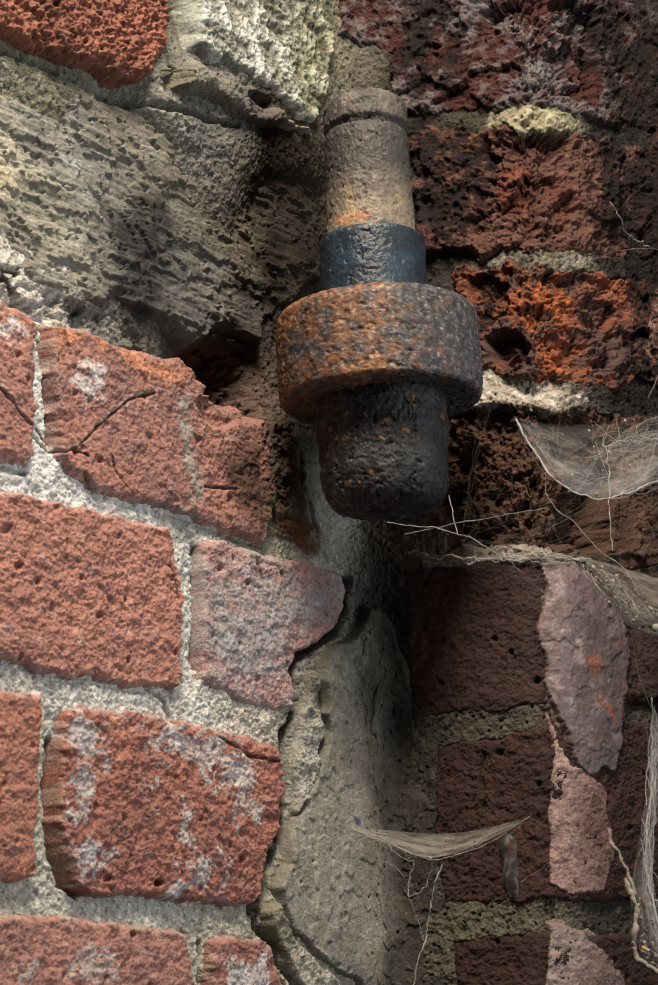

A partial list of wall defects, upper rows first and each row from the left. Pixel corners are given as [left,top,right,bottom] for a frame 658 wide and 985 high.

crack [288,640,322,668]
efflorescence [56,713,108,826]
efflorescence [144,716,261,824]
efflorescence [75,837,113,877]
efflorescence [154,856,214,907]
efflorescence [10,958,38,985]
efflorescence [67,944,120,983]
efflorescence [221,949,270,985]